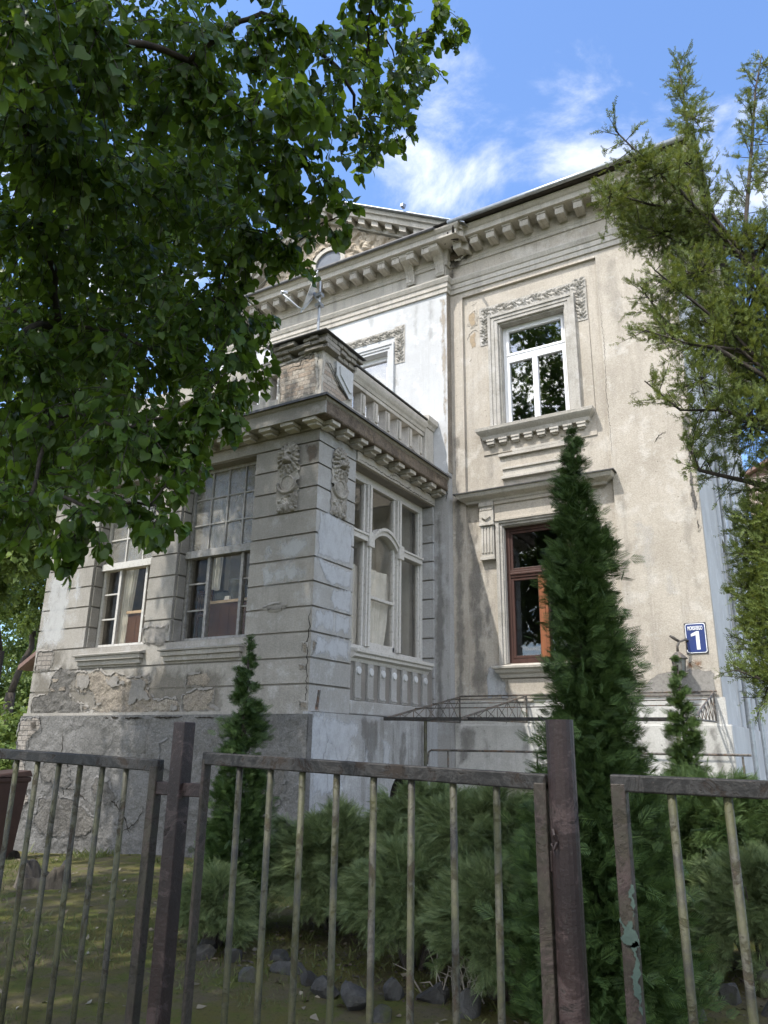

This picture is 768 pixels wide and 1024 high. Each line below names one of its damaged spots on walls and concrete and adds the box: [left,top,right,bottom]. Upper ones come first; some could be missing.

spalling [276,352,448,491]
spalling [12,649,220,775]
crack [299,608,311,705]